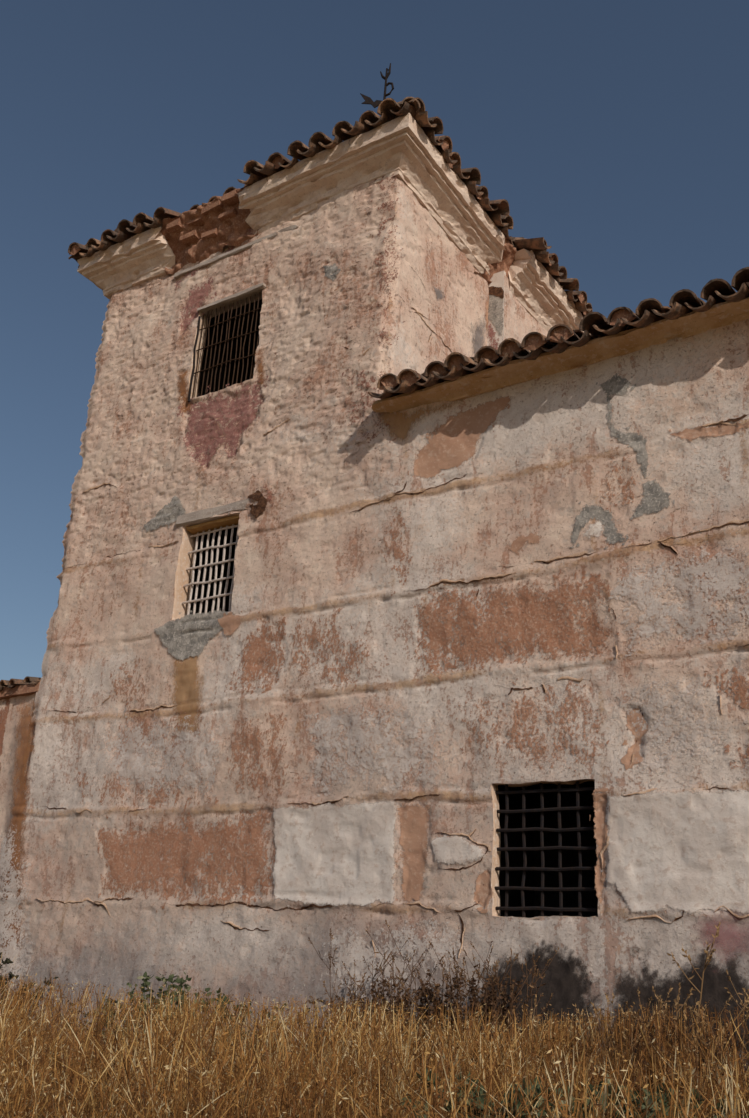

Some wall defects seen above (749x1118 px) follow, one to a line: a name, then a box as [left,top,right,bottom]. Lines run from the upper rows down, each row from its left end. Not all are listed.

flaking render [166,189,240,247]
crack [401,268,453,353]
peeling [176,375,270,477]
peeling [407,396,511,479]
crack [701,414,749,428]
crack [352,476,465,512]
crack [405,551,592,596]
crack [620,520,749,555]
peeling [411,565,652,779]
peeling [703,664,749,770]
peeling [74,607,374,913]
crack [38,829,491,958]